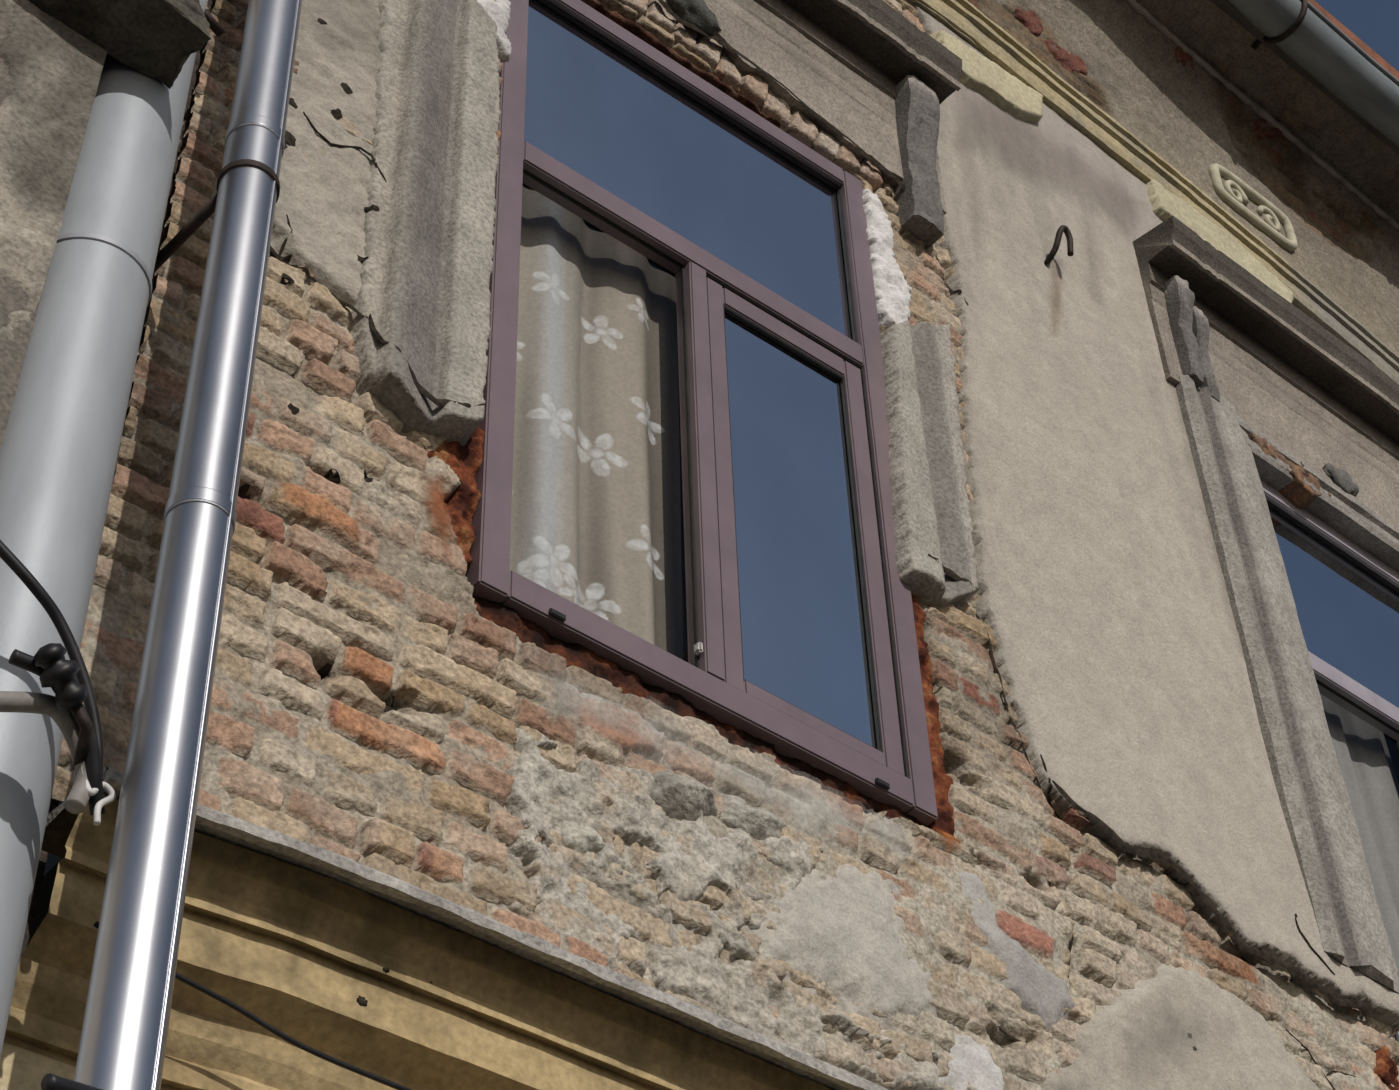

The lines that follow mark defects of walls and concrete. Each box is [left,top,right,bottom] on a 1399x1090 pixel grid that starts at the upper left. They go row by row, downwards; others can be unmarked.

spalling [1014,7,1088,76]
spalling [284,130,296,149]
crack [303,112,387,182]
crack [270,214,487,408]
spalling [238,483,250,499]
spalling [324,468,341,484]
corrosion [430,481,450,530]
spalling [317,661,335,679]
spalling [384,696,397,712]
crack [928,554,1383,1015]
spalling [504,728,947,1090]
crack [997,1026,1027,1045]